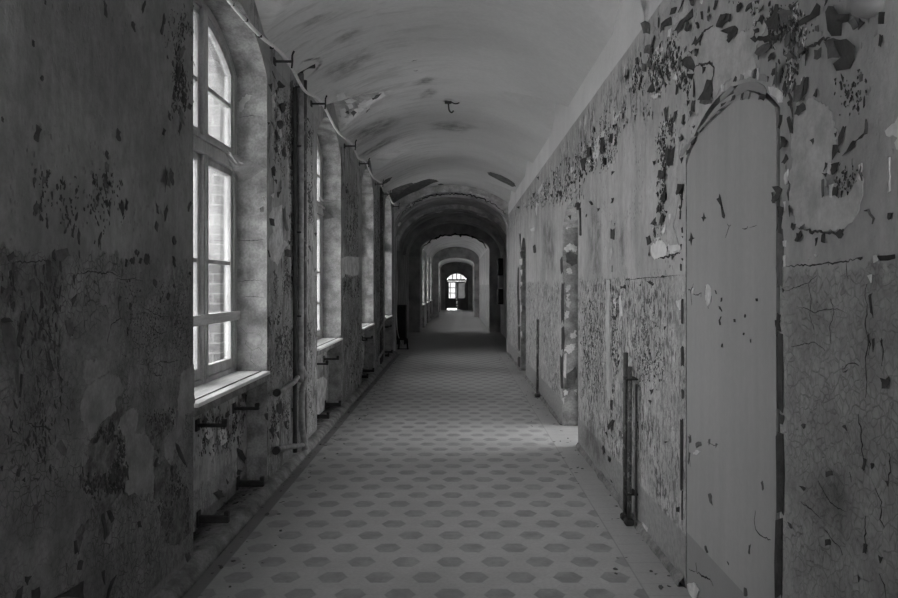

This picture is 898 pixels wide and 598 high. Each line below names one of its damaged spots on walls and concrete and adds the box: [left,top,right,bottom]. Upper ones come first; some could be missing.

peeling [33,150,128,247]
peeling [160,5,195,135]
peeling [238,71,317,384]
peeling [337,92,385,125]
spalling [487,172,516,187]
flaking render [517,0,875,462]
flaking render [885,117,898,193]
flaking render [66,358,247,570]
peeling [264,397,293,442]
spalling [676,419,718,520]
crack [787,229,895,596]